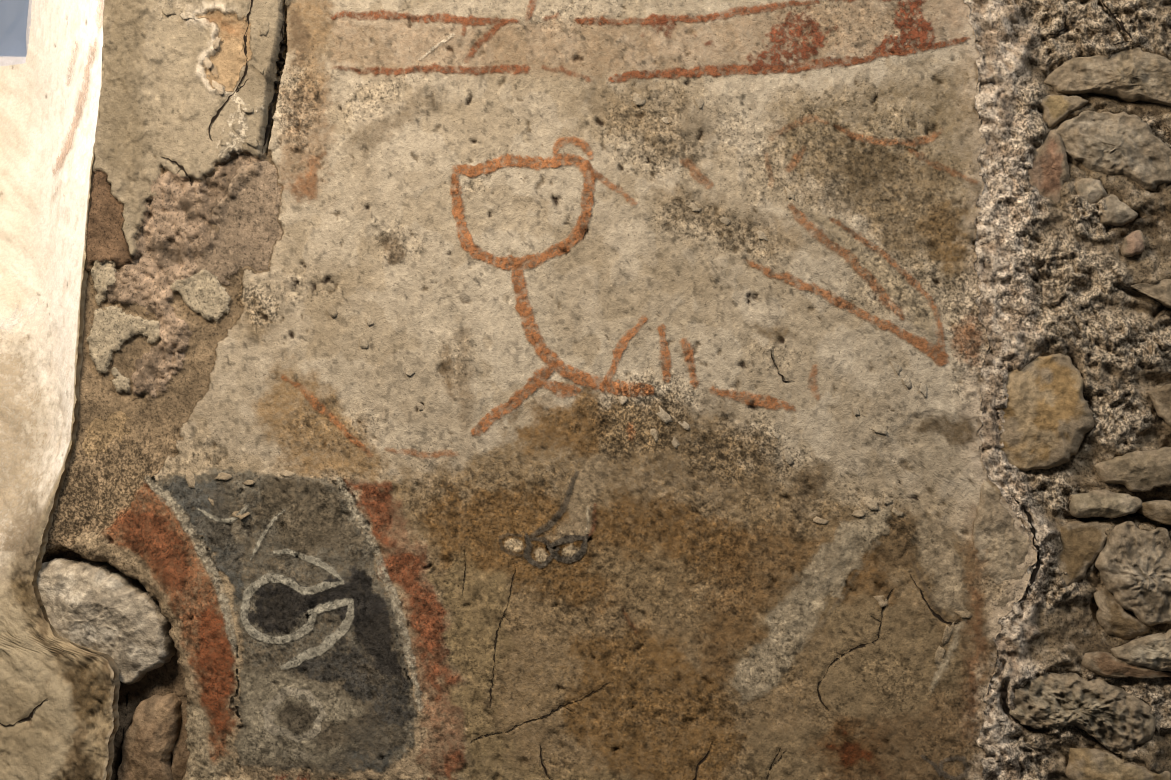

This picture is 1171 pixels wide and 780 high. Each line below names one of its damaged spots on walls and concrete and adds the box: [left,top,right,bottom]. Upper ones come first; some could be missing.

crack [208,0,285,150]
spalling [42,0,284,563]
crack [490,570,516,704]
crack [817,575,958,711]
crack [470,682,610,780]